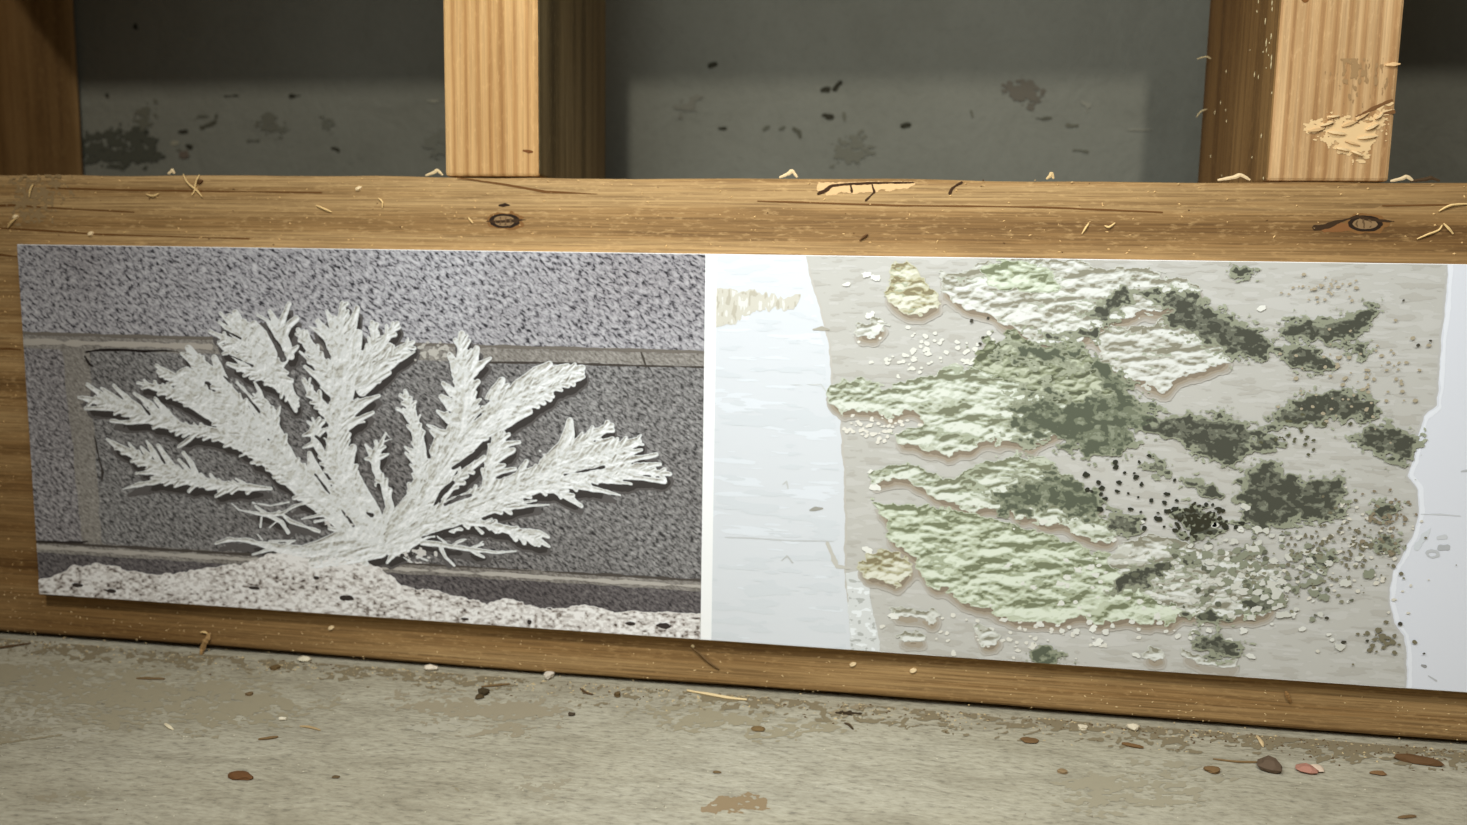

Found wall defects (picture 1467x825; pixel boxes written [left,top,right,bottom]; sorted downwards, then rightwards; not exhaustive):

efflorescence [77,301,672,569]
flaking render [711,255,1467,692]
leakage [826,258,1457,648]
leakage [1141,645,1238,668]
leakage [1341,620,1426,665]